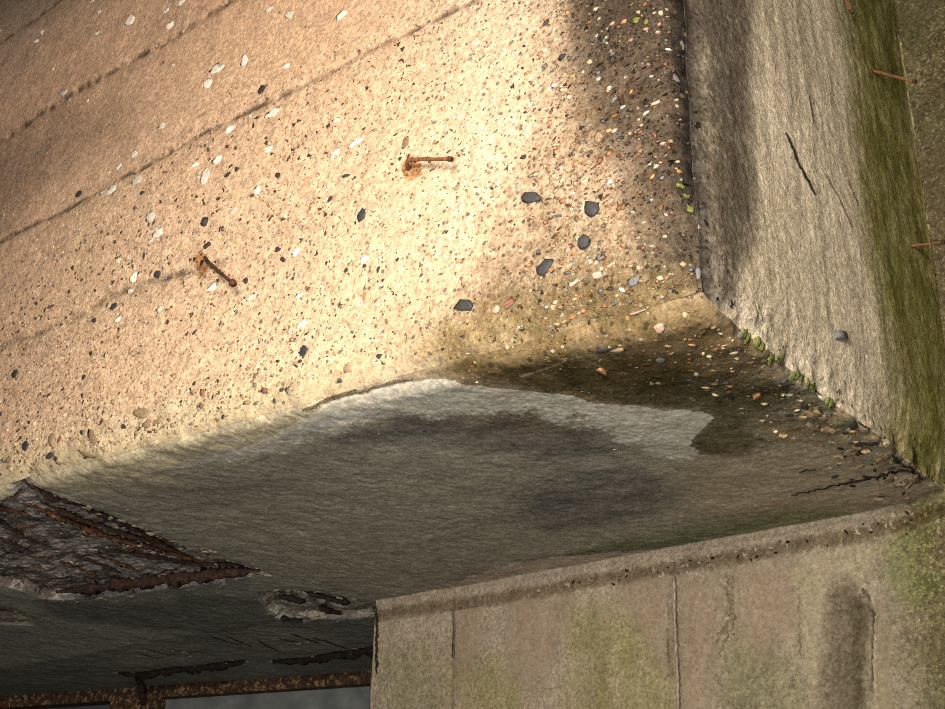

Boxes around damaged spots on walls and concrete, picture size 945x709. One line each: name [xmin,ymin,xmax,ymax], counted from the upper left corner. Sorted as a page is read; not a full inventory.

spalling [45,0,931,501]
spalling [0,230,393,603]
leakage [180,370,713,468]
leakage [0,446,105,484]
peeling [839,511,923,547]
spalling [259,589,375,623]
leakage [738,544,891,709]
rust [118,659,247,680]
rust [272,646,373,665]